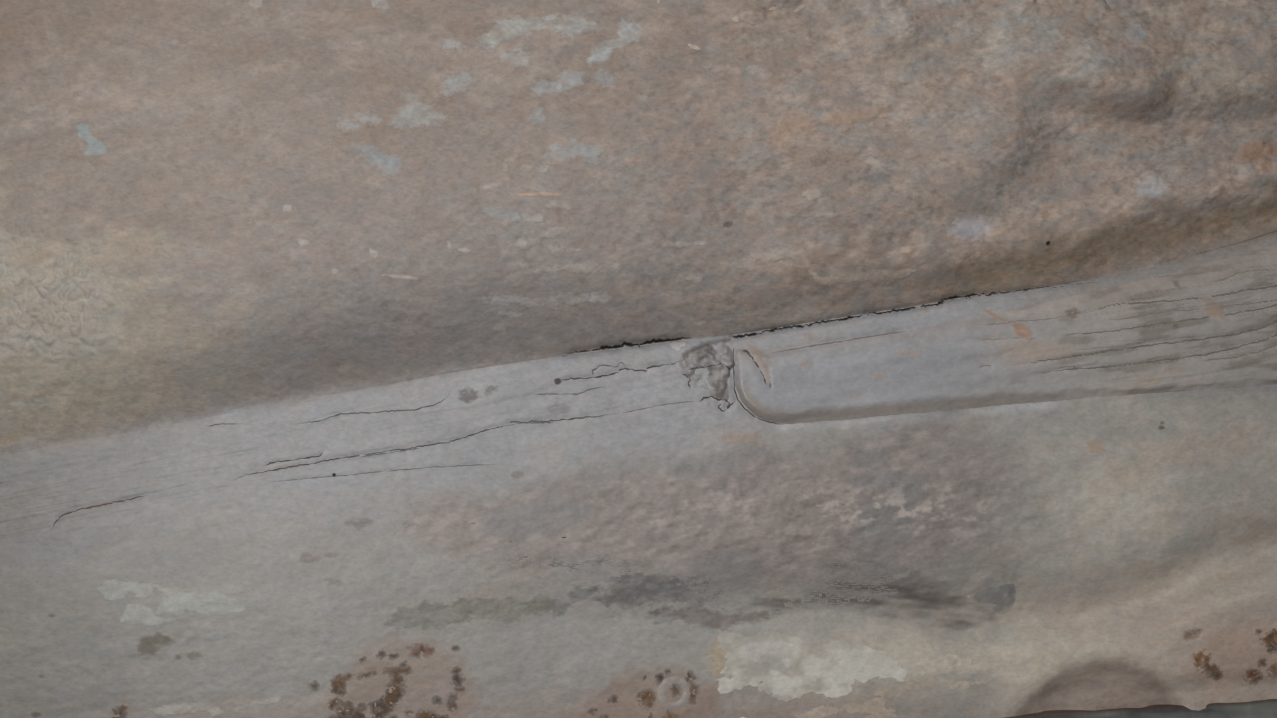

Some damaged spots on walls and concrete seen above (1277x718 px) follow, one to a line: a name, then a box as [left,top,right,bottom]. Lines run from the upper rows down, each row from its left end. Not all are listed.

peeling [668,341,686,352]
crack [231,269,1277,482]
crack [50,495,149,531]
rust [306,630,484,718]
rust [555,662,733,718]
leakage [383,551,1006,698]
rust [1177,612,1277,696]